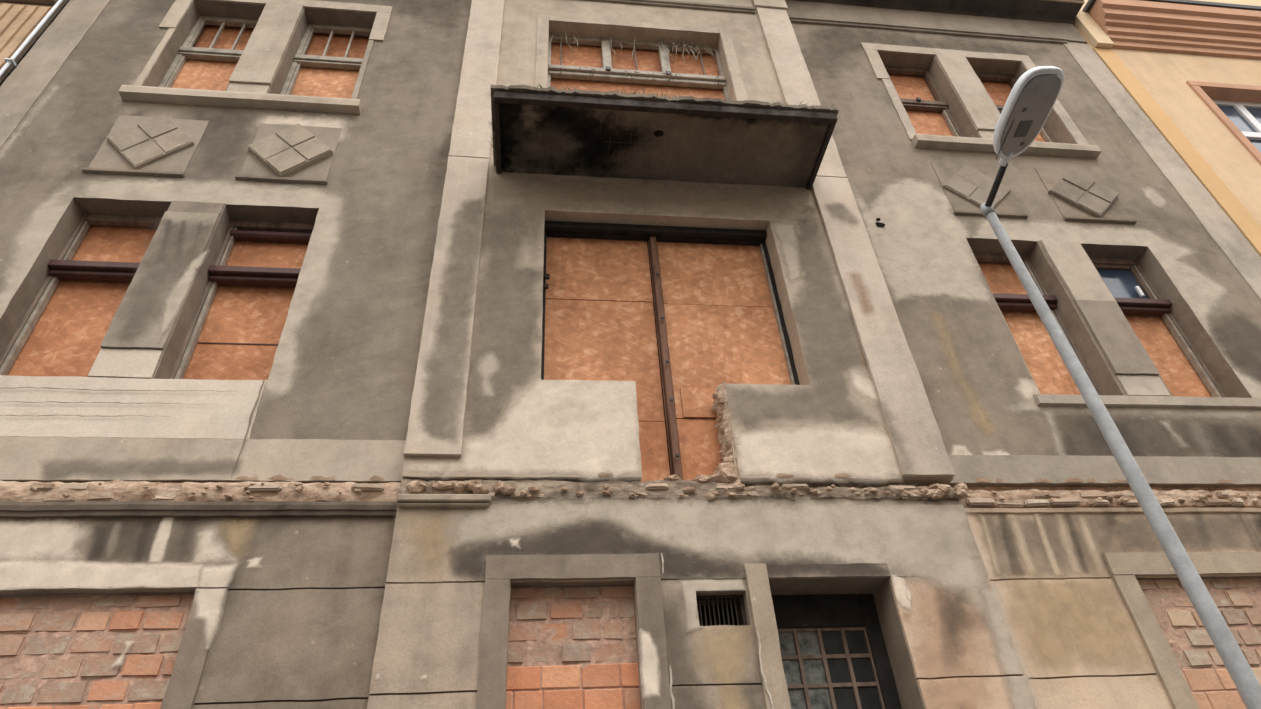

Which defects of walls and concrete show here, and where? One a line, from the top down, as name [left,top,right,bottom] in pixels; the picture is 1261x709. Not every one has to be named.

water stain [493,94,642,175]
spalling [712,382,759,500]
flaking render [30,483,114,501]
flaking render [224,475,297,491]
flaking render [630,483,669,499]
flaking render [776,473,808,489]
flaking render [888,484,952,500]
flaking render [965,477,1139,508]
flaking render [1204,480,1257,508]